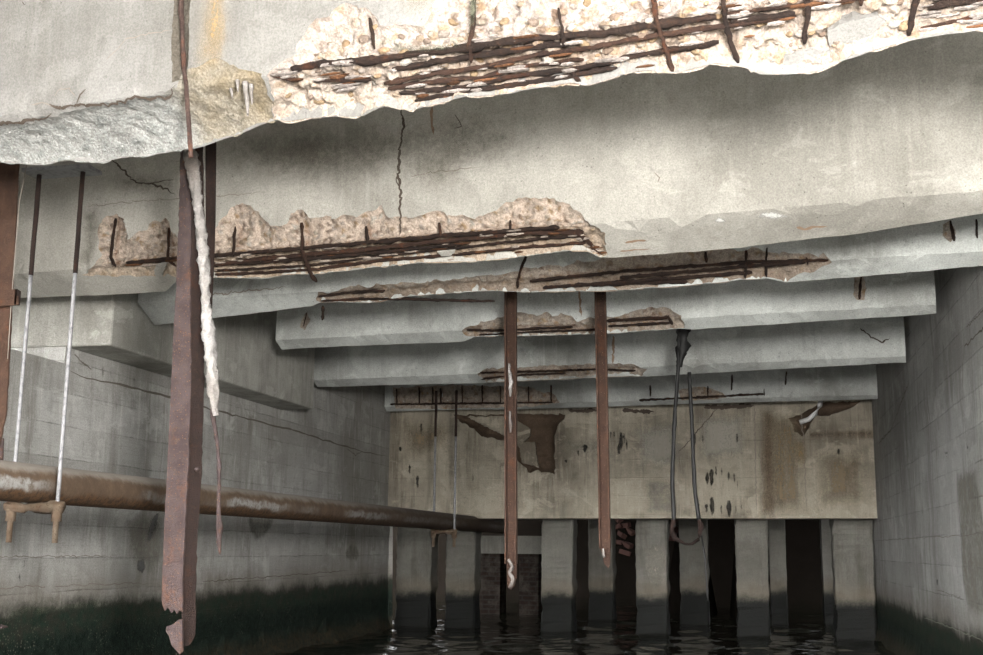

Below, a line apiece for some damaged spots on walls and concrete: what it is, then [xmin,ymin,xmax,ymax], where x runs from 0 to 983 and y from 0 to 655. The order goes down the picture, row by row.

spalling [0,0,983,165]
crack [89,160,179,207]
crack [395,106,475,235]
spalling [83,214,178,284]
leakage [183,149,220,416]
spalling [214,197,832,320]
spalling [462,316,504,337]
spalling [517,312,595,336]
spalling [607,307,685,334]
spalling [390,367,504,440]
spalling [517,363,596,474]
spalling [789,401,860,437]